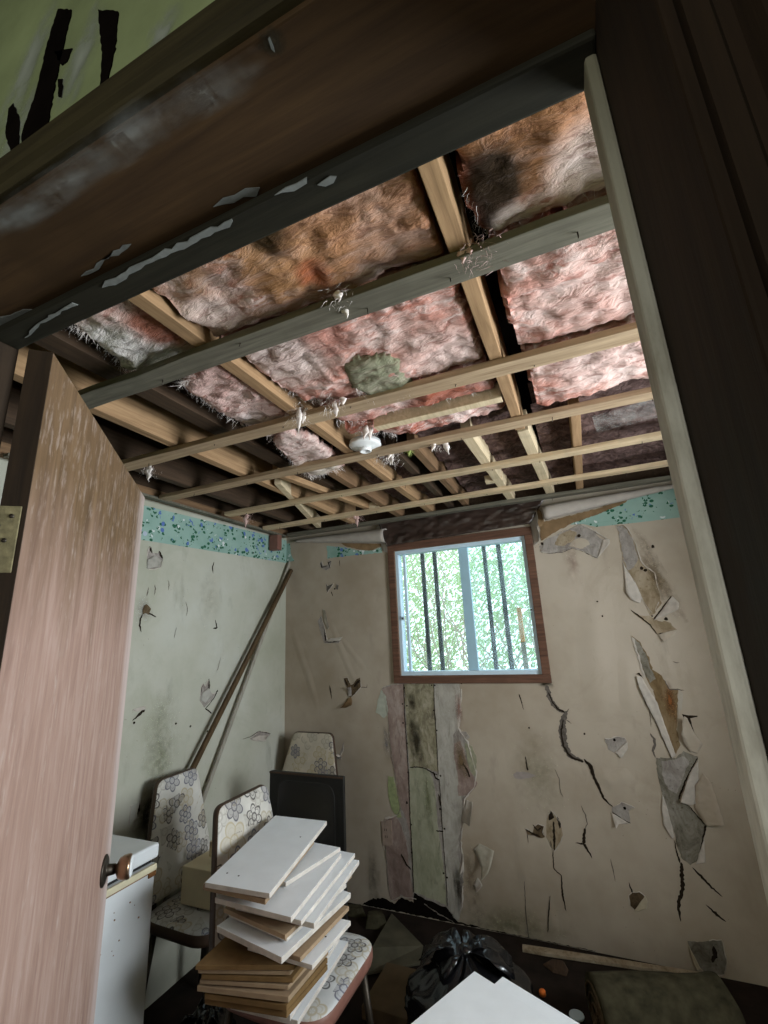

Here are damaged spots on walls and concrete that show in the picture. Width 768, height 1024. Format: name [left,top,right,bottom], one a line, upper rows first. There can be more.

peeling [213,187,260,207]
peeling [275,176,337,195]
peeling [81,219,233,288]
peeling [25,303,78,338]
peeling [376,683,494,922]
crack [519,685,615,878]
crack [524,855,566,938]
crack [677,862,726,922]